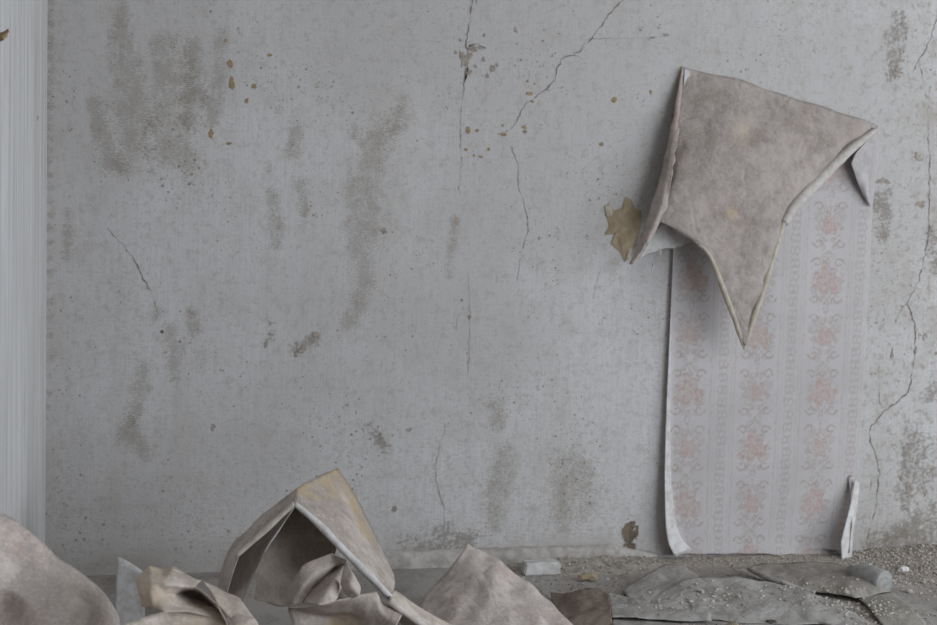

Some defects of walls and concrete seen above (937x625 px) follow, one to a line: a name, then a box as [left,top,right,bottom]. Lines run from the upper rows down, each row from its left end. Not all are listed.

crack [460,0,487,149]
crack [506,1,669,289]
peeling [604,197,641,262]
crack [867,20,937,539]